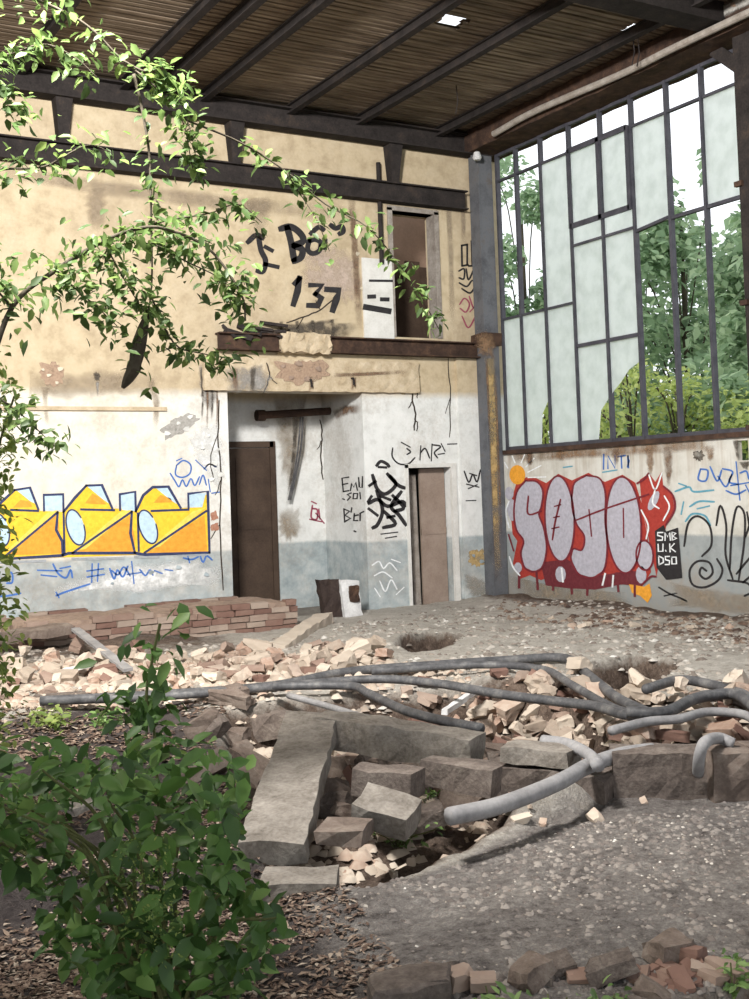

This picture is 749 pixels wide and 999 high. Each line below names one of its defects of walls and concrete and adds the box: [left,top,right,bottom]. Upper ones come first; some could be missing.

spalling [274,331,333,386]
rust [479,334,494,355]
leakage [279,407,303,486]
rust [486,368,501,526]